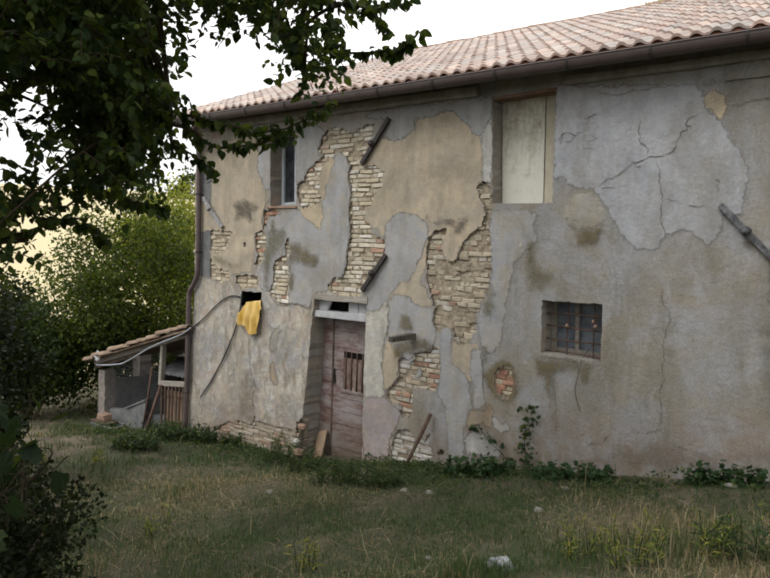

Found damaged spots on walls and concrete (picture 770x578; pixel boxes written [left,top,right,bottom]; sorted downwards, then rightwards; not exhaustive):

peeling [193,136,278,292]
spalling [269,238,290,307]
peeling [297,110,493,462]
crack [559,114,598,149]
crack [595,111,704,239]
spalling [211,416,309,455]
spalling [494,365,514,400]
crack [634,280,672,442]